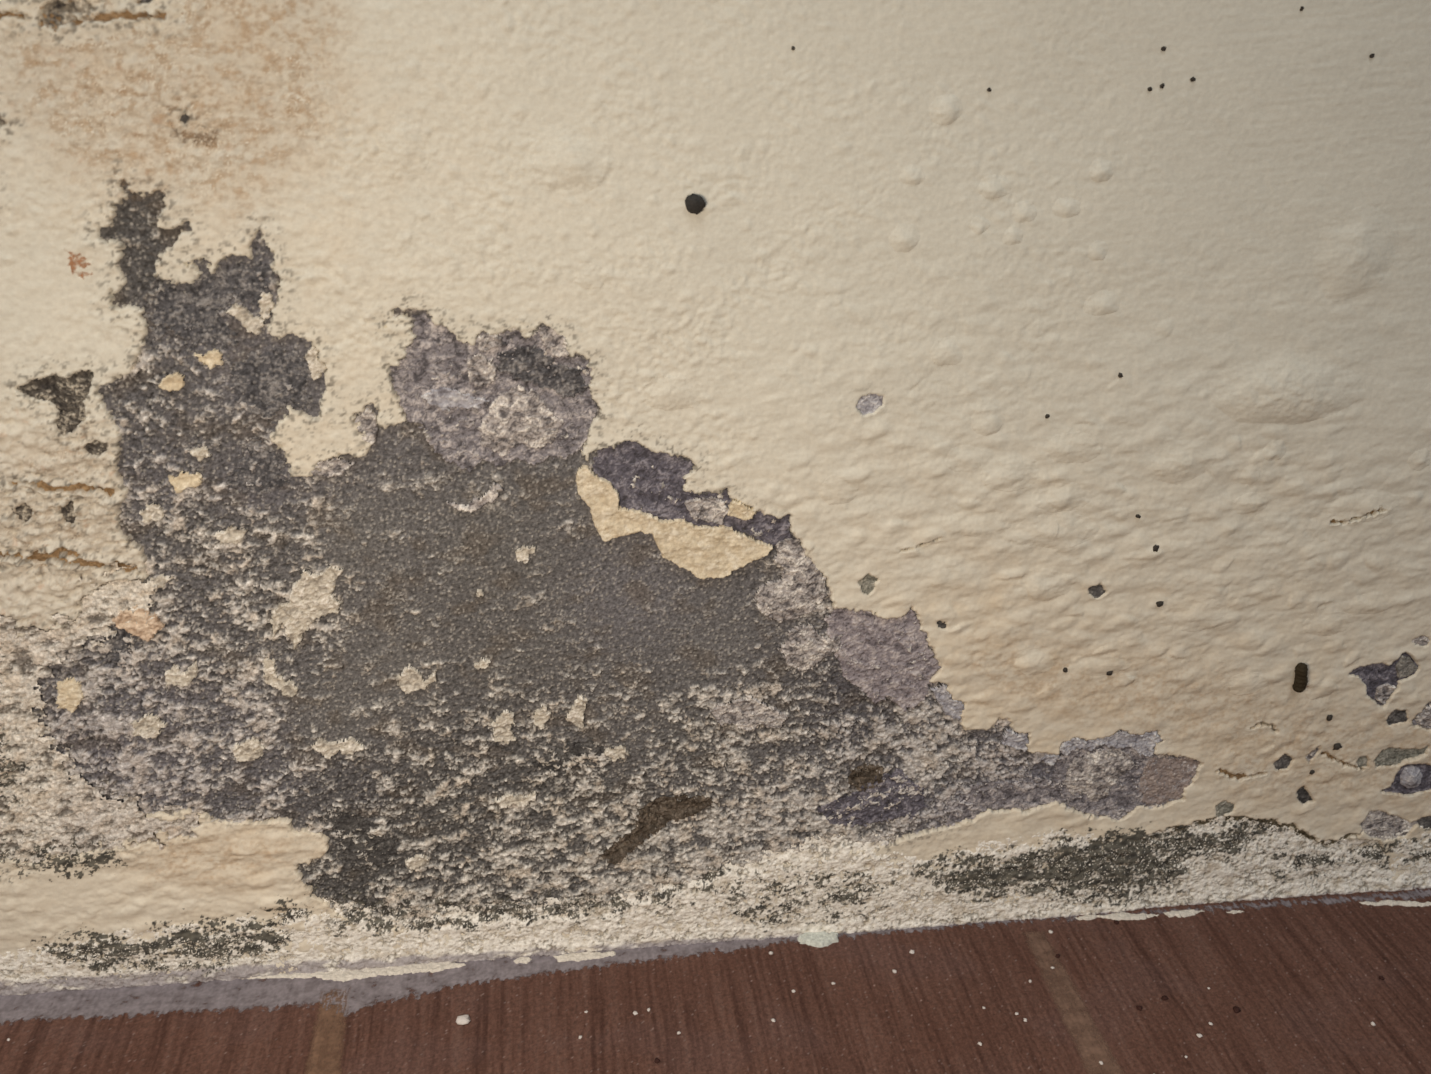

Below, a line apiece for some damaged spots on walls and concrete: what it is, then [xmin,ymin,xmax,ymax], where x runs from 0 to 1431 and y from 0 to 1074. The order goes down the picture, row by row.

peeling [0,179,1431,996]
damp [0,728,44,807]
damp [0,837,128,882]
damp [31,816,1431,978]